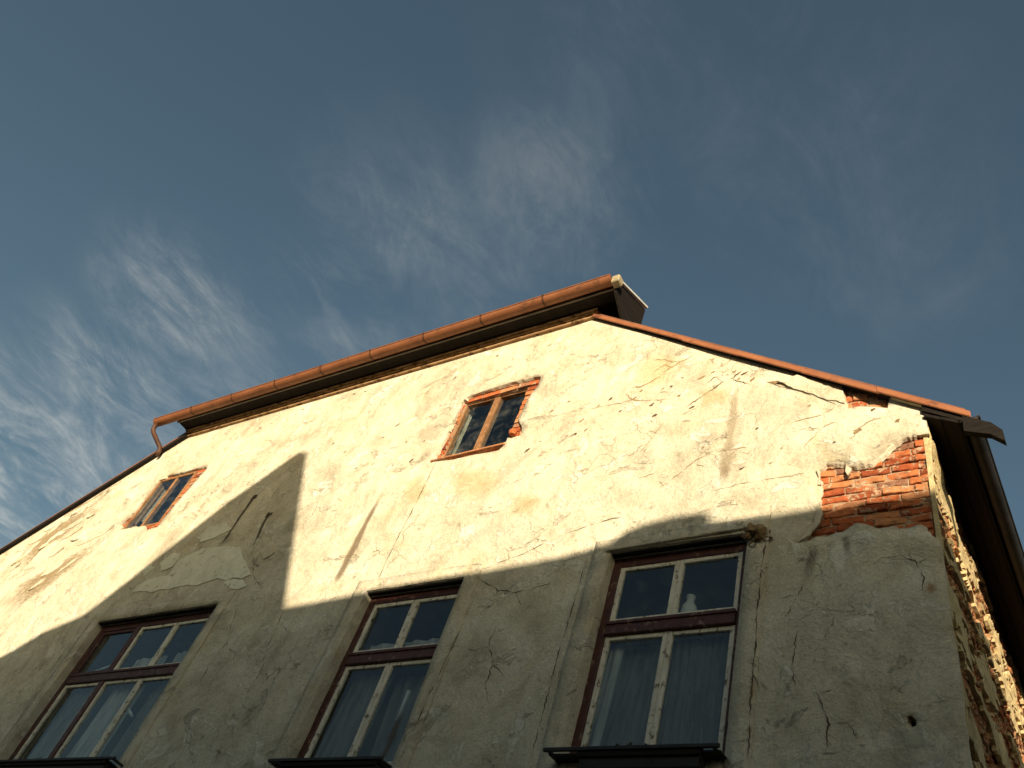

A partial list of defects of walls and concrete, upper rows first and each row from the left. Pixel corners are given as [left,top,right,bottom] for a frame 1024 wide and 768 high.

flaking render [430,376,541,462]
flaking render [768,374,889,411]
crack [774,384,888,448]
flaking render [9,465,207,600]
flaking render [132,522,251,593]
crack [399,517,622,763]
crack [747,512,857,759]
flaking render [798,435,1024,768]